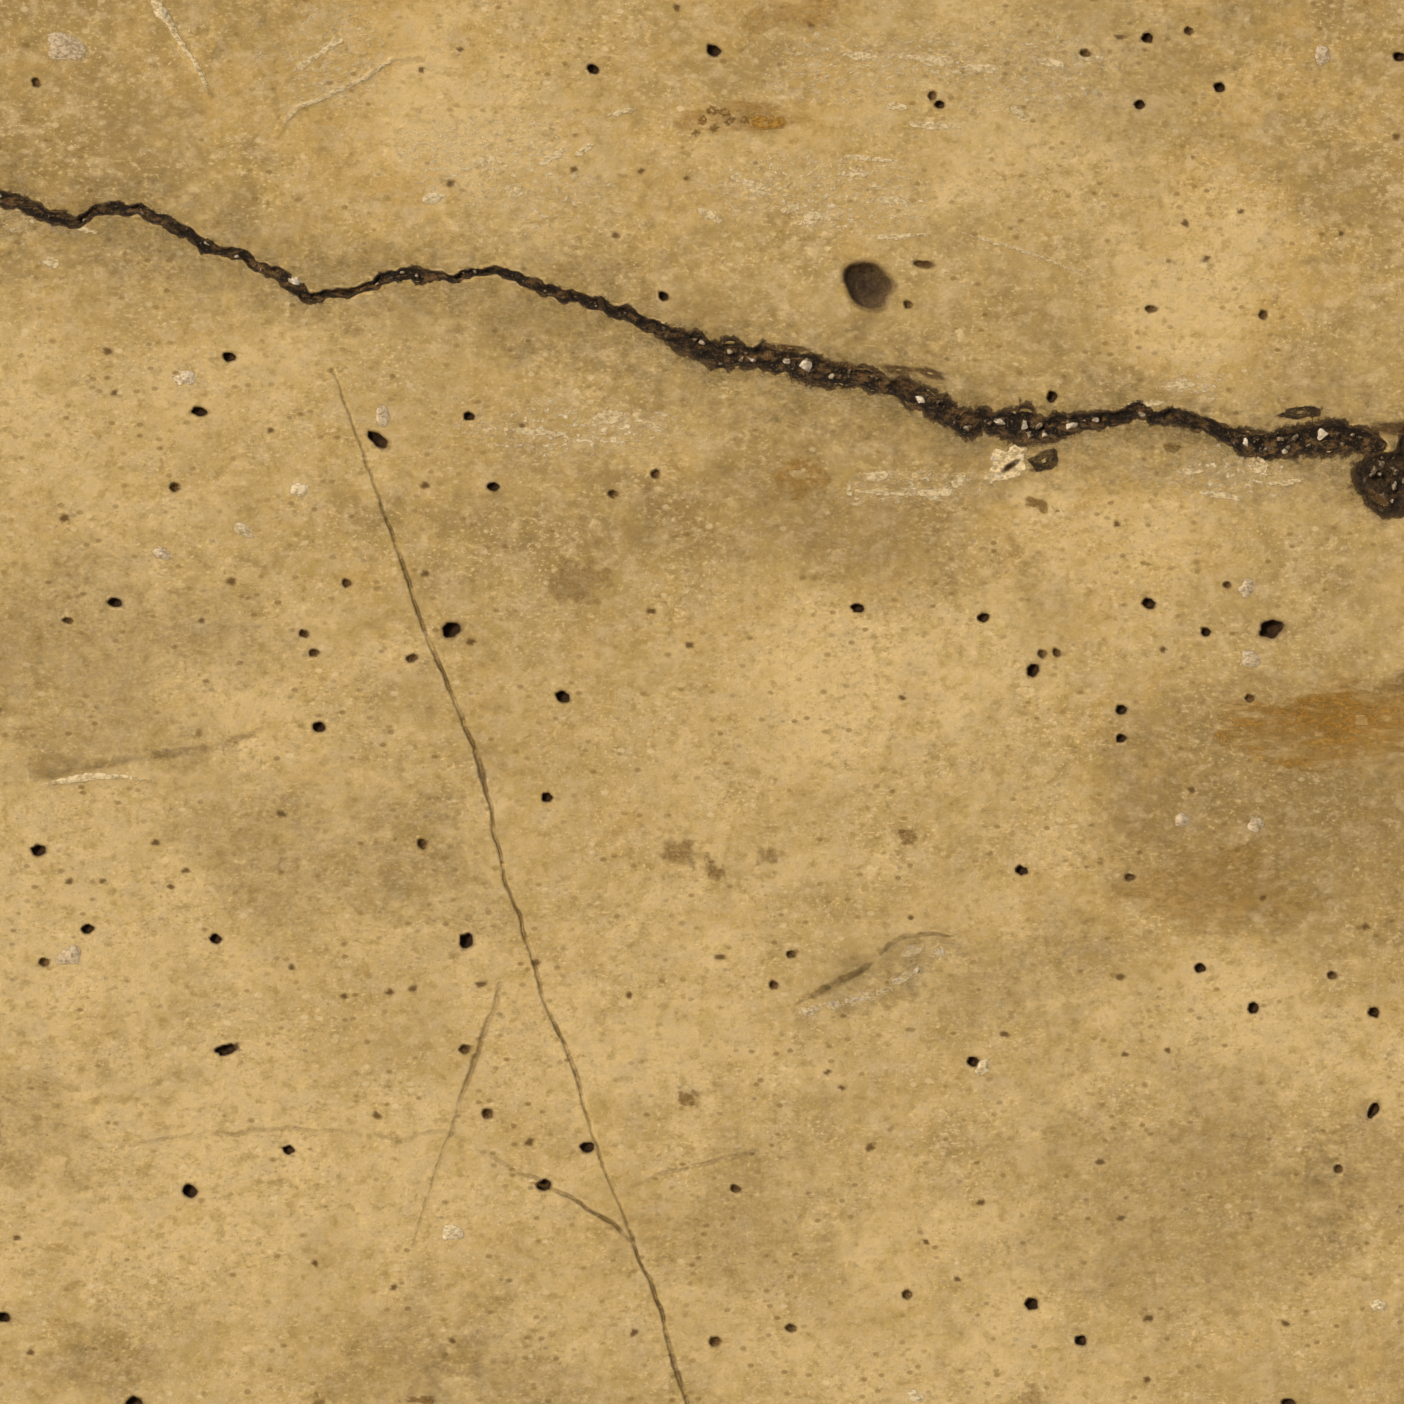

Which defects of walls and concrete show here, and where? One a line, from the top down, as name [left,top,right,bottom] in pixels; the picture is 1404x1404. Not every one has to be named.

crack [0,190,1387,472]
crack [385,520,579,1087]
crack [566,1196,689,1404]